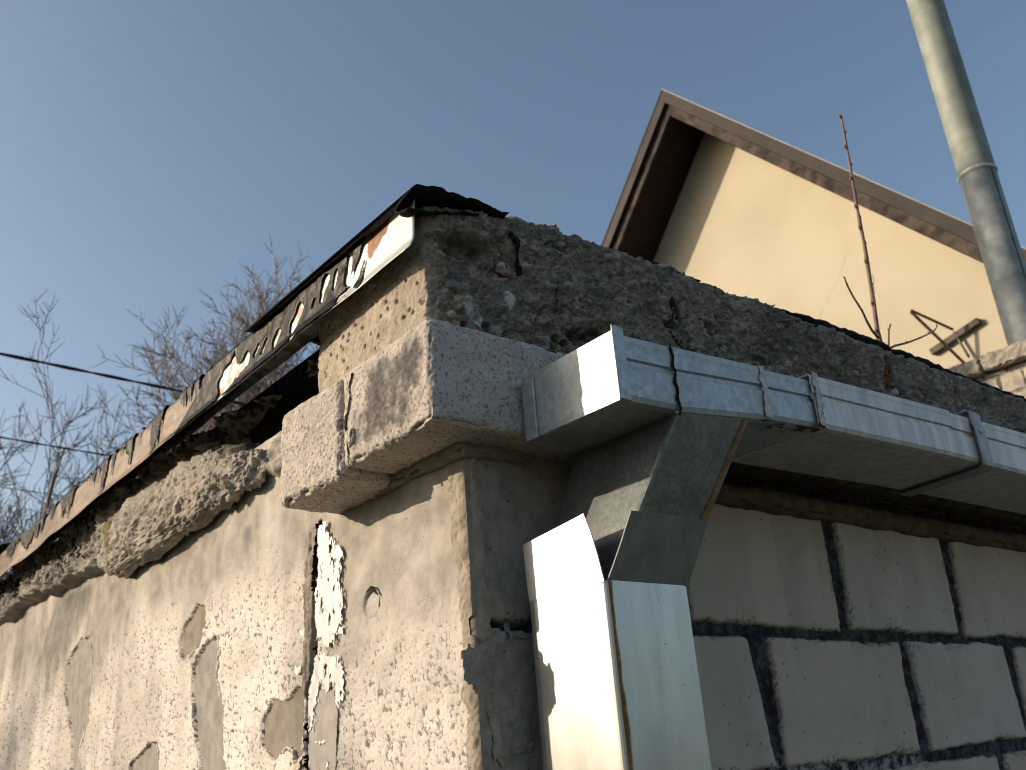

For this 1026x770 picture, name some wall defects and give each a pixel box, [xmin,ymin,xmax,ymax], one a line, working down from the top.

crack [344,373,353,465]
water stain [355,340,421,444]
corrosion [883,356,896,390]
peeling [63,635,93,770]
peeling [128,739,160,770]
peeling [179,604,226,770]
peeling [261,520,344,763]